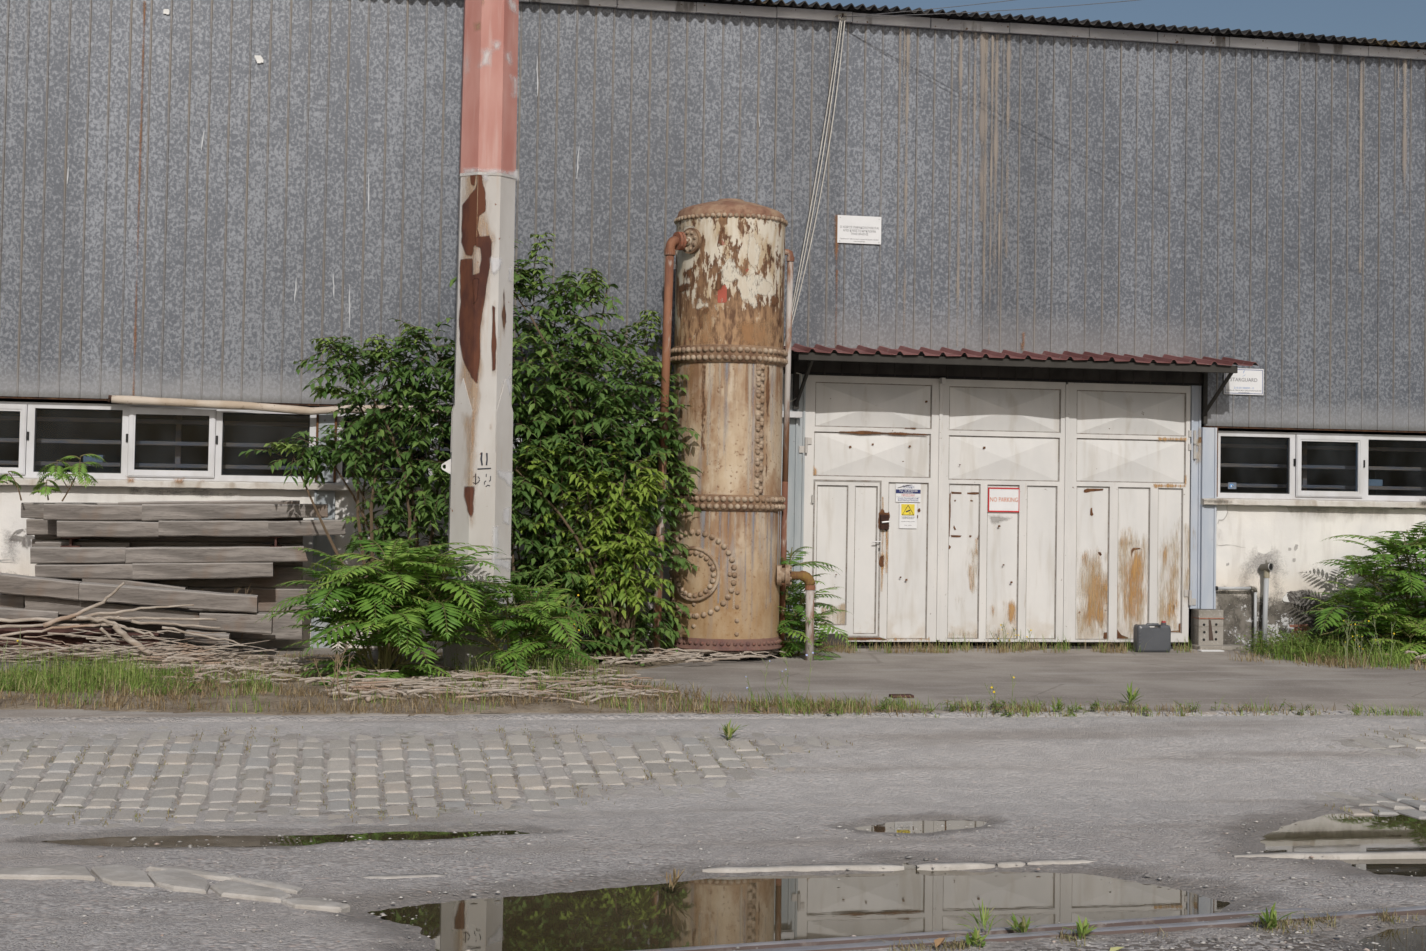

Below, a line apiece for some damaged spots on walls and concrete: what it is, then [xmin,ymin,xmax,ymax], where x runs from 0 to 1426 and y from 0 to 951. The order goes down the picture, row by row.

corrosion [459,175,506,516]
corrosion [687,363,728,465]
corrosion [749,364,776,418]
corrosion [1079,540,1189,640]